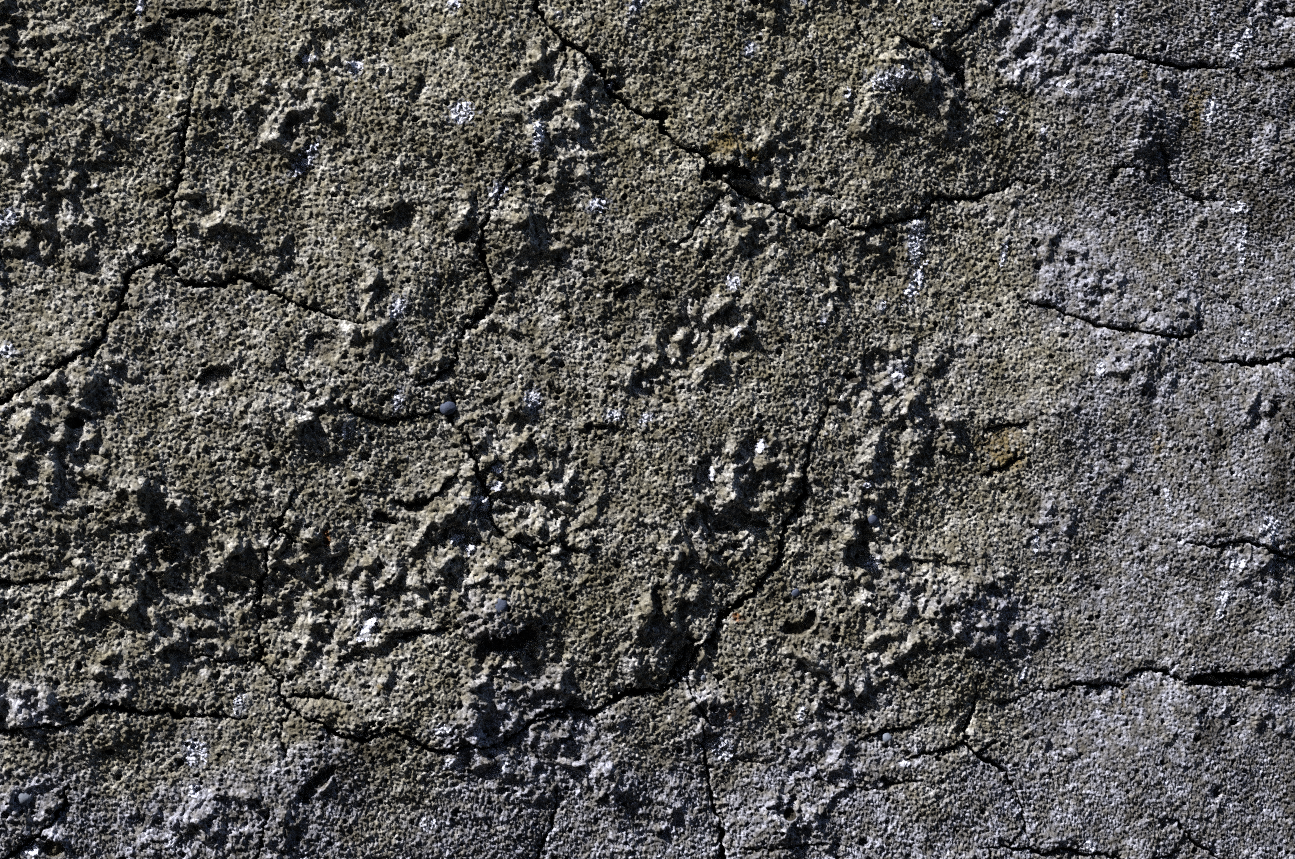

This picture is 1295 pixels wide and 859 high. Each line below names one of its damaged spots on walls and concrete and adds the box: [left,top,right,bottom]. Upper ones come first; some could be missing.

crack [532,0,1030,245]
crack [0,82,364,409]
crack [280,157,589,552]
crack [1020,297,1295,368]
crack [0,578,67,586]
crack [0,696,245,736]
crack [178,403,857,859]
crack [814,661,1291,859]